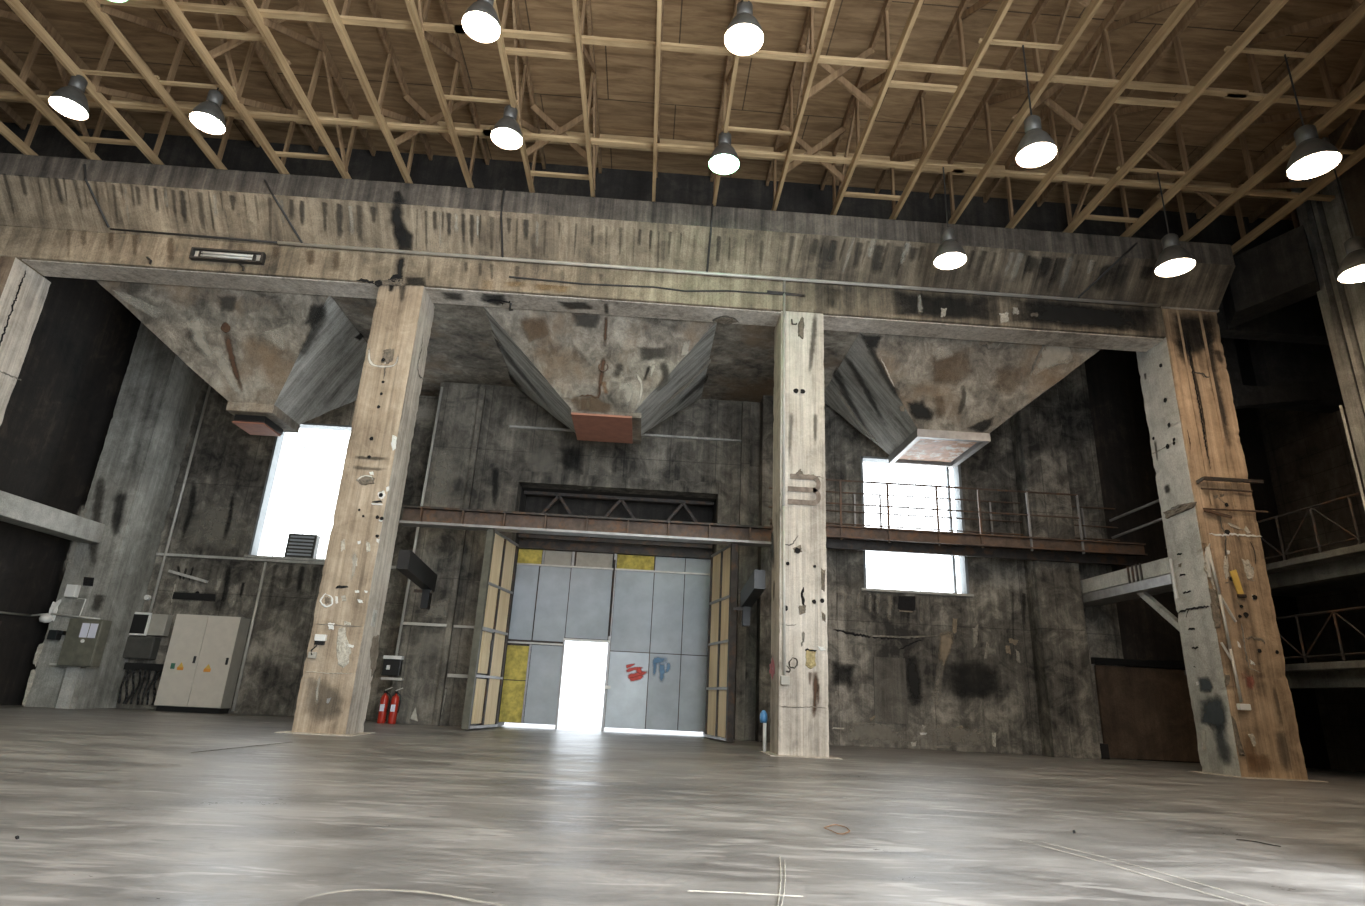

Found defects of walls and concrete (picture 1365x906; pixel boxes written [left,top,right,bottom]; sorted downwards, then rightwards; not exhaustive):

leakage [1202,726,1229,762]